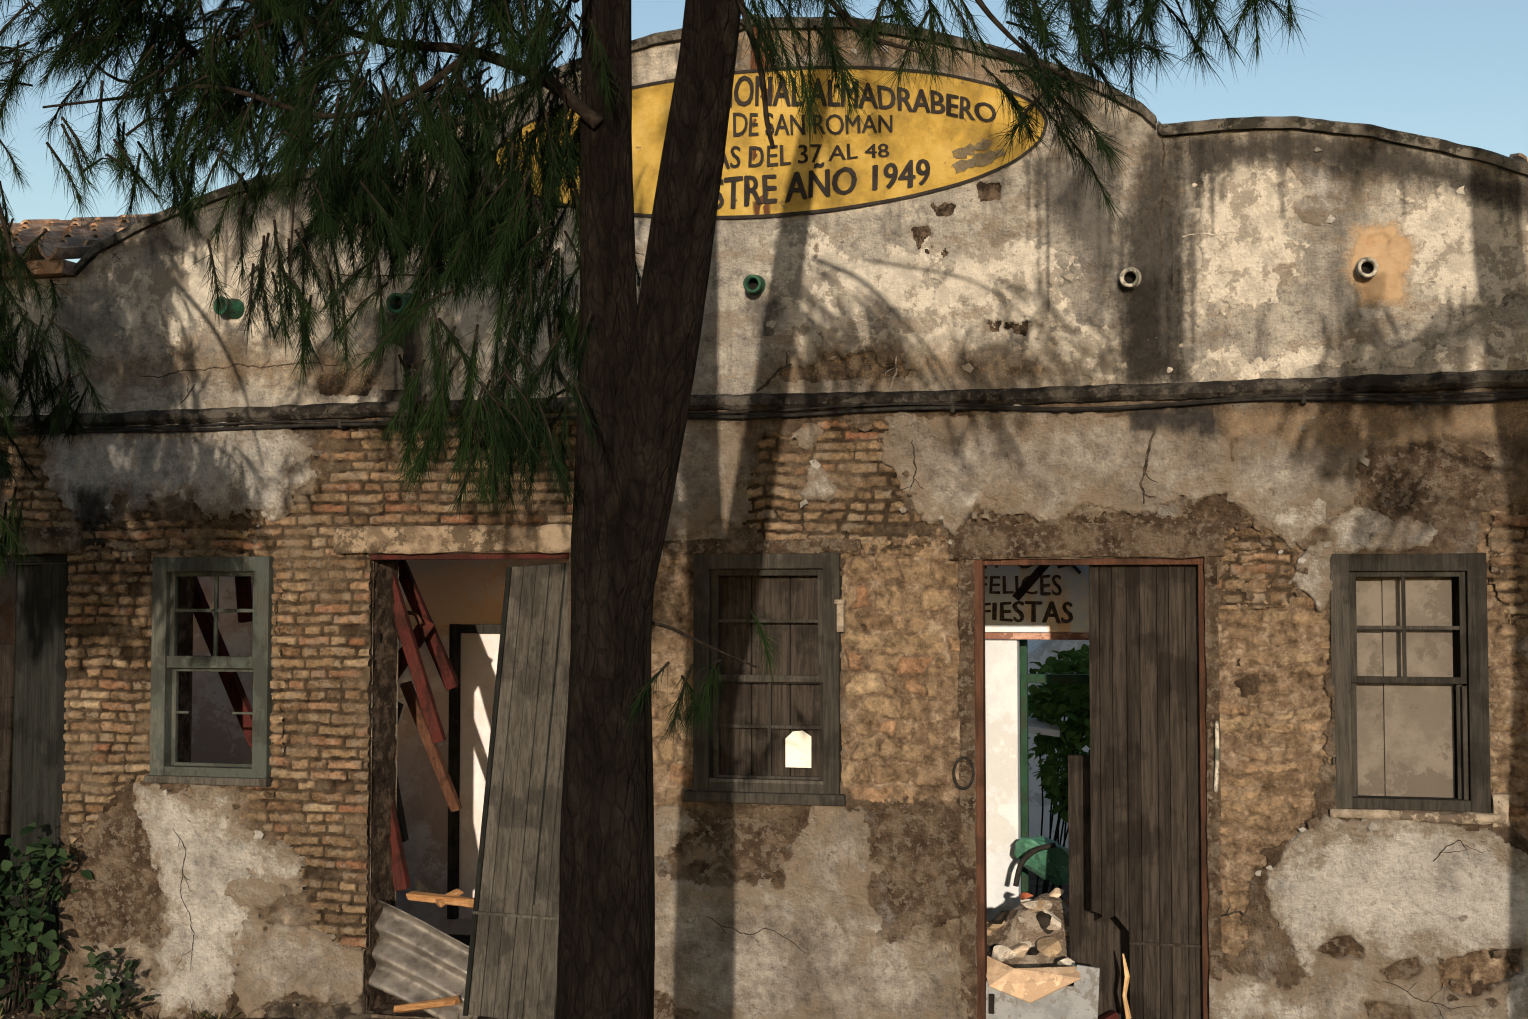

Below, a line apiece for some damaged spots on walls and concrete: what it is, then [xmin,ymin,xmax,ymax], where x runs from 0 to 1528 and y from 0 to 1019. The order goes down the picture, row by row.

damp [737,36,751,62]
damp [144,179,329,264]
peeling [106,235,380,357]
flaking render [317,368,377,397]
damp [748,297,779,338]
peeling [758,202,1131,386]
damp [765,29,1528,388]
peeling [1180,147,1355,321]
peeling [1167,180,1528,382]
flaking render [0,420,576,1019]
flaking render [651,404,1528,1019]